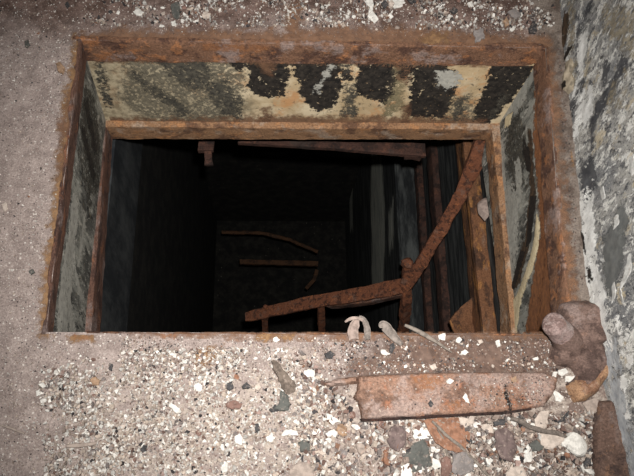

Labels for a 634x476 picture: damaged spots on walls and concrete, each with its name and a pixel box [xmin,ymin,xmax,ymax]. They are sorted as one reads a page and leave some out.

damp [126,70,191,117]
damp [158,61,243,121]
damp [382,67,406,116]
damp [452,98,467,121]
damp [78,99,98,210]
rust [37,1,552,338]
rust [256,332,320,343]